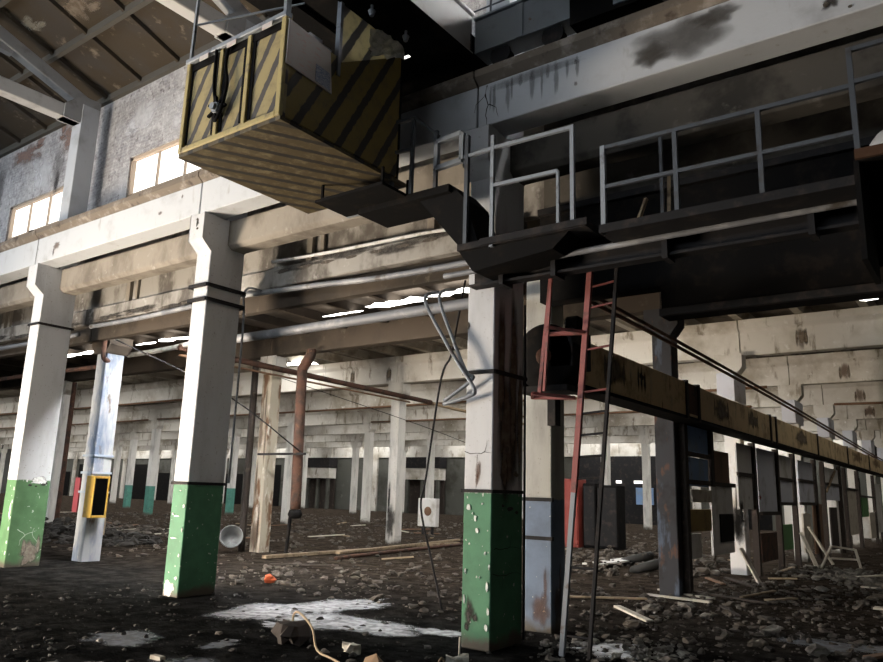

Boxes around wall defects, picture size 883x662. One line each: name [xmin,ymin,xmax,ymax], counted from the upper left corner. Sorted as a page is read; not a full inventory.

damp [695,5,735,25]
damp [638,46,663,65]
peeling [26,476,48,487]
corrosion [534,567,561,621]